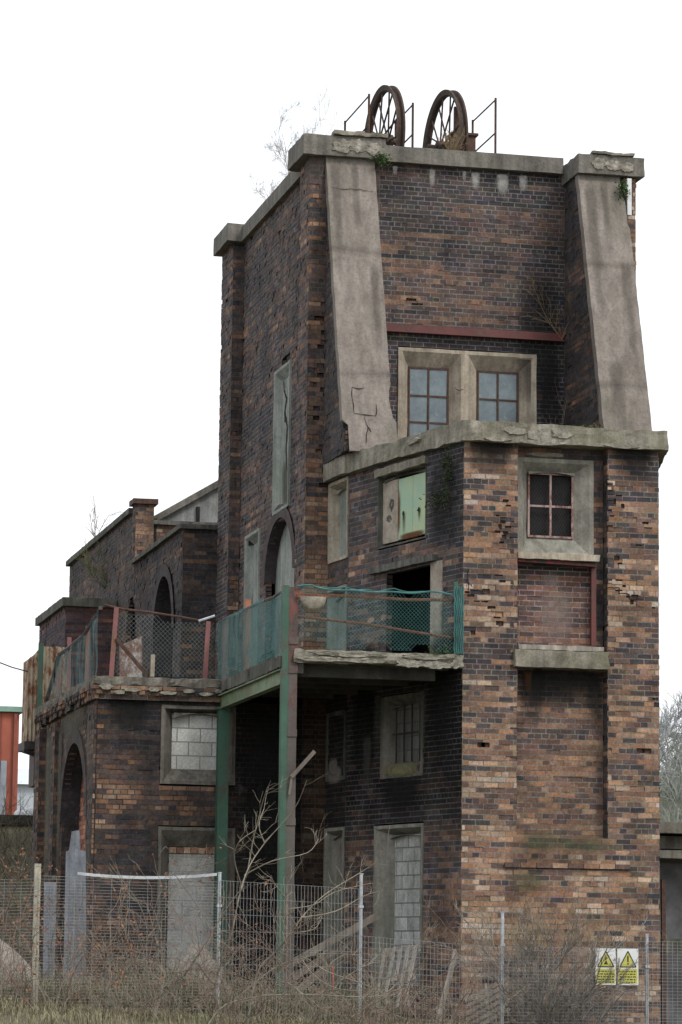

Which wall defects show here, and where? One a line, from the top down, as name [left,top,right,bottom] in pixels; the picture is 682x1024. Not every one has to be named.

spalling [331,138,386,157]
spalling [591,157,634,173]
water stain [498,174,527,188]
crack [281,381,289,467]
crack [351,387,377,442]
spalling [484,426,573,457]
corrosion [398,496,422,539]
spalling [604,579,638,604]